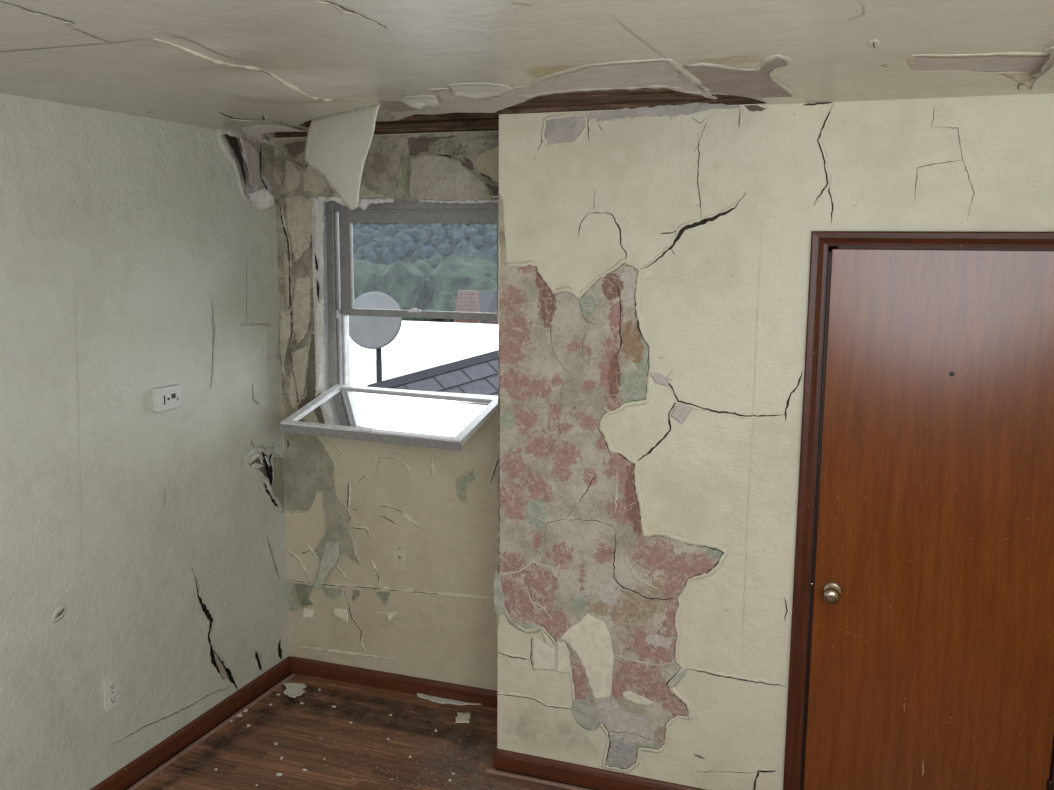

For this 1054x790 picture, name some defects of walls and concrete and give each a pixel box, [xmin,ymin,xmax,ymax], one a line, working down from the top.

crack [0,1,367,102]
crack [315,0,386,28]
peeling [907,47,1054,90]
crack [578,17,746,269]
crack [804,102,834,222]
crack [915,107,975,220]
crack [260,434,303,512]
peeling [217,54,798,773]
crack [637,216,802,686]
crack [111,449,493,745]